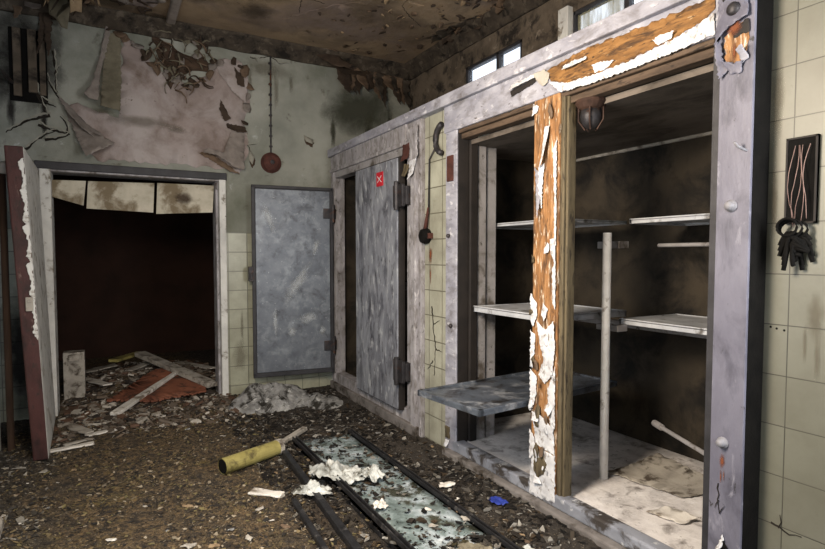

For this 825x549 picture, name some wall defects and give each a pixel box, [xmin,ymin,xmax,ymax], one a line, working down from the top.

peeling [12,0,101,56]
peeling [56,26,255,174]
peeling [509,0,750,97]
peeling [528,103,557,503]